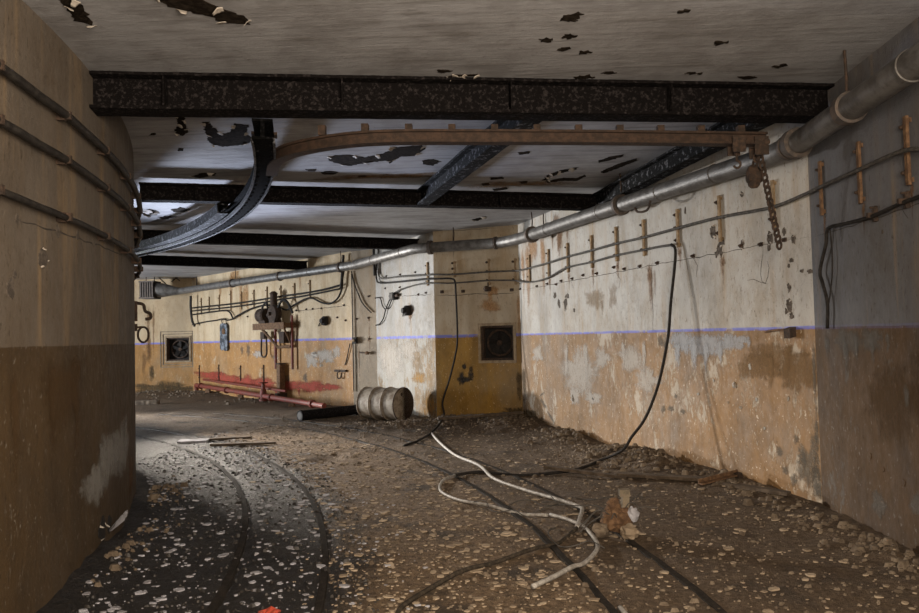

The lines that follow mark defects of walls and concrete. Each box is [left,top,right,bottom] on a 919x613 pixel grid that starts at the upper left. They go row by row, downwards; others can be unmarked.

peeling [60,0,97,27]
peeling [156,0,251,27]
peeling [200,122,251,147]
peeling [305,145,441,175]
peeling [306,346,340,367]